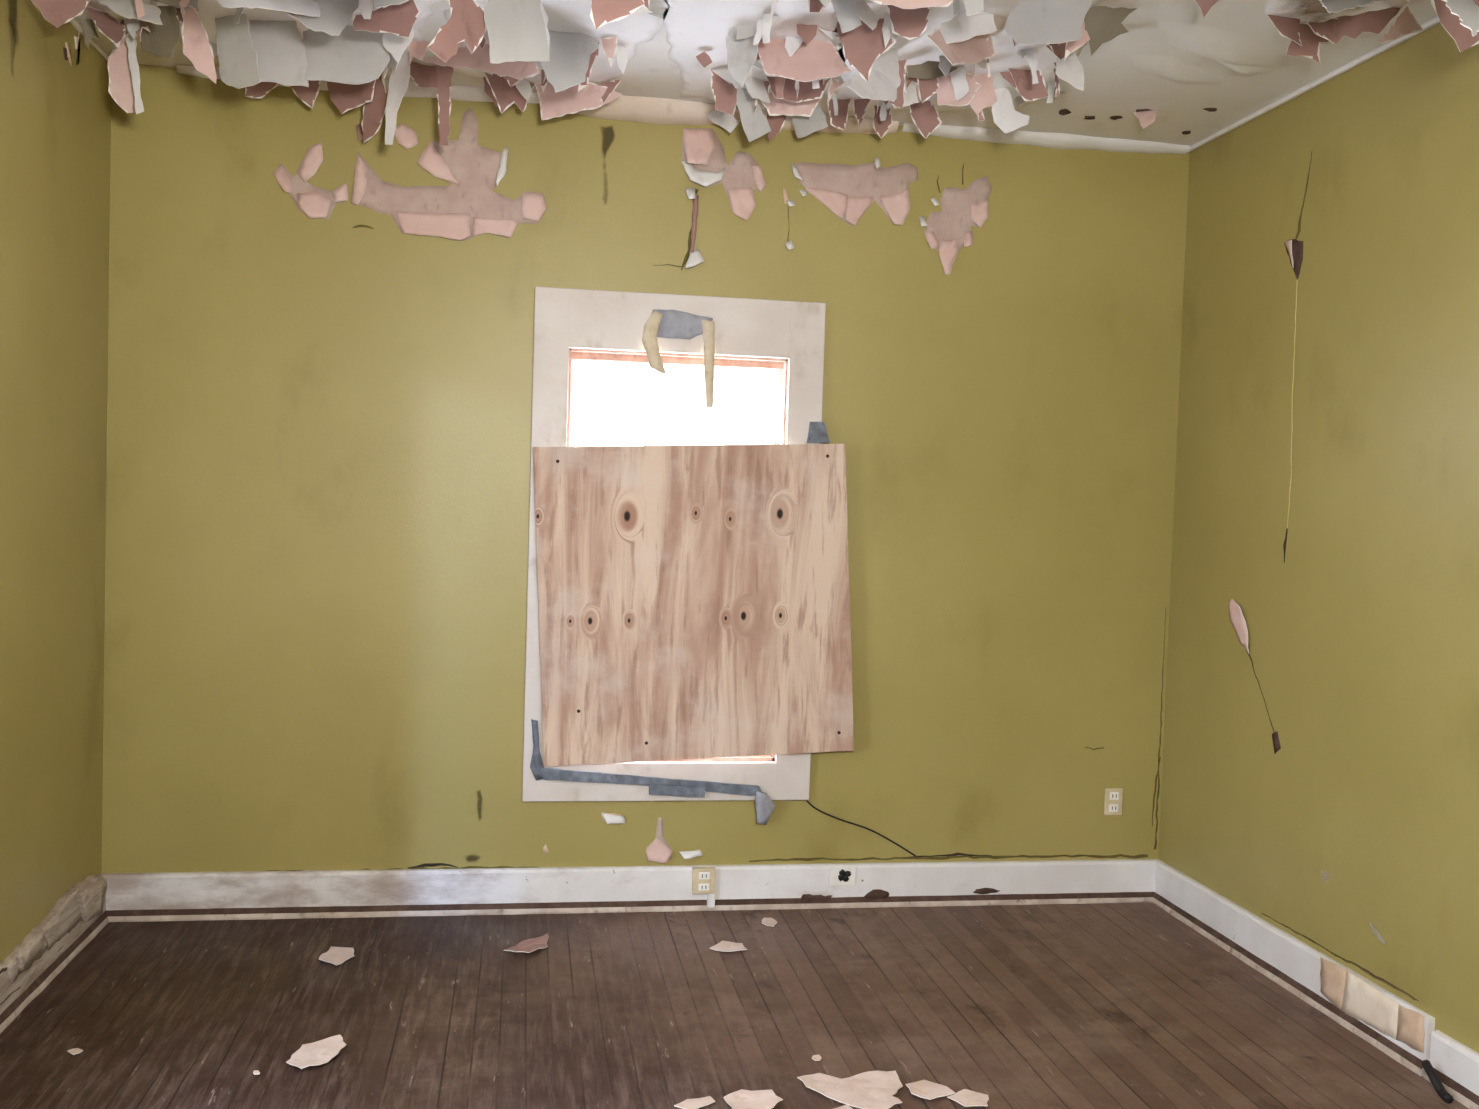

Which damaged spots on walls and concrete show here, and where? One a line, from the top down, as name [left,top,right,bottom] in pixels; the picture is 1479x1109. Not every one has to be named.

peeling [1194,0,1219,18]
peeling [1264,0,1423,64]
peeling [1431,0,1479,52]
peeling [31,0,1157,275]
crack [1283,152,1312,563]
peeling [646,818,703,863]